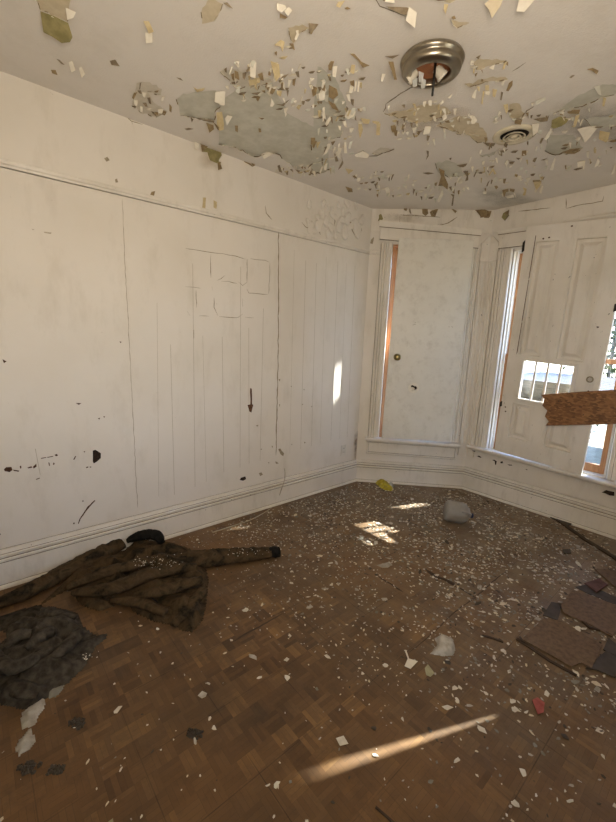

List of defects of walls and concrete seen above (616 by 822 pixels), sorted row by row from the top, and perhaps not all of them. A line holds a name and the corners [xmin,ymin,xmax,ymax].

peeling [36,0,76,43]
peeling [132,0,616,217]
crack [265,207,279,451]